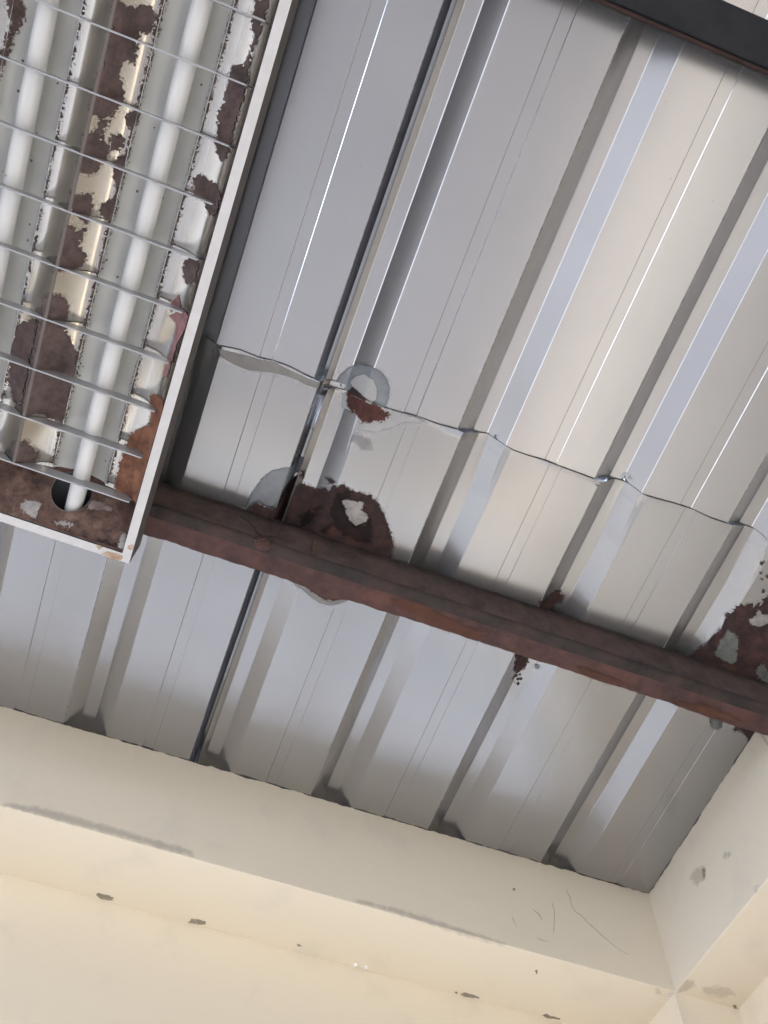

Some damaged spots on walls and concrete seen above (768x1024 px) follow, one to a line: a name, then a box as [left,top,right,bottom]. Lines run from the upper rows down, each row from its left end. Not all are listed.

corrosion [0,0,169,466]
corrosion [105,0,269,503]
corrosion [344,387,391,424]
corrosion [248,470,394,558]
corrosion [393,599,483,640]
corrosion [539,589,564,611]
corrosion [689,561,768,683]
corrosion [512,654,539,685]
corrosion [578,667,622,686]
corrosion [675,702,755,741]